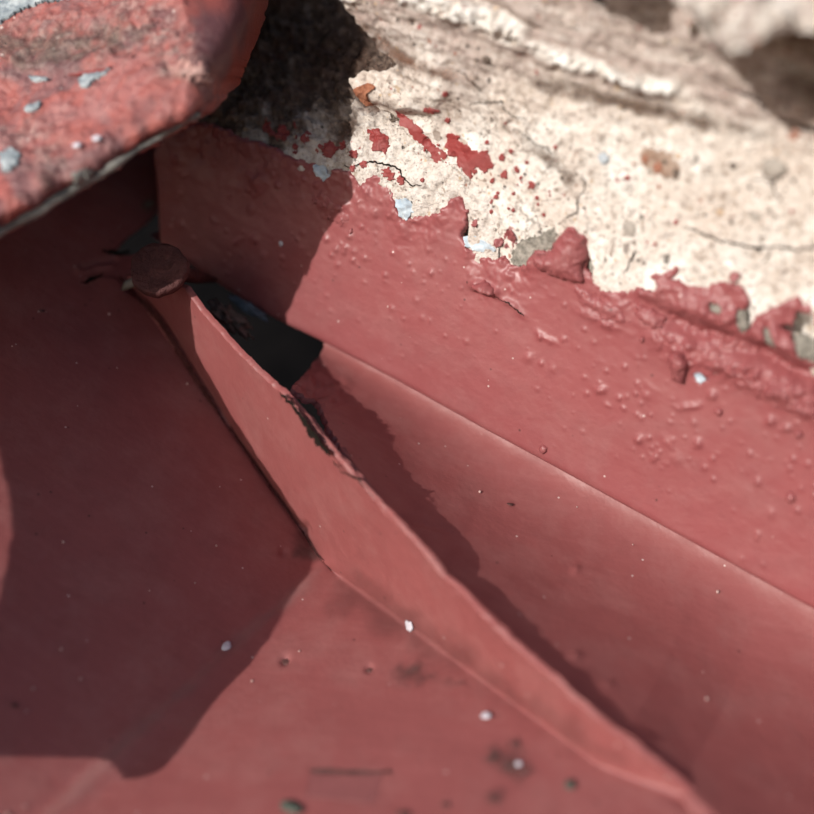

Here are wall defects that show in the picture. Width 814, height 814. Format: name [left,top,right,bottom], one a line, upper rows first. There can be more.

peeling [0,0,63,25]
crack [455,69,556,155]
crack [727,89,814,132]
peeling [367,128,390,155]
crack [345,161,421,187]
peeling [381,167,404,185]
peeling [395,111,546,217]
crack [565,174,586,219]
spalling [640,147,682,180]
spalling [463,219,558,267]
crack [685,226,814,263]
crack [280,393,378,503]